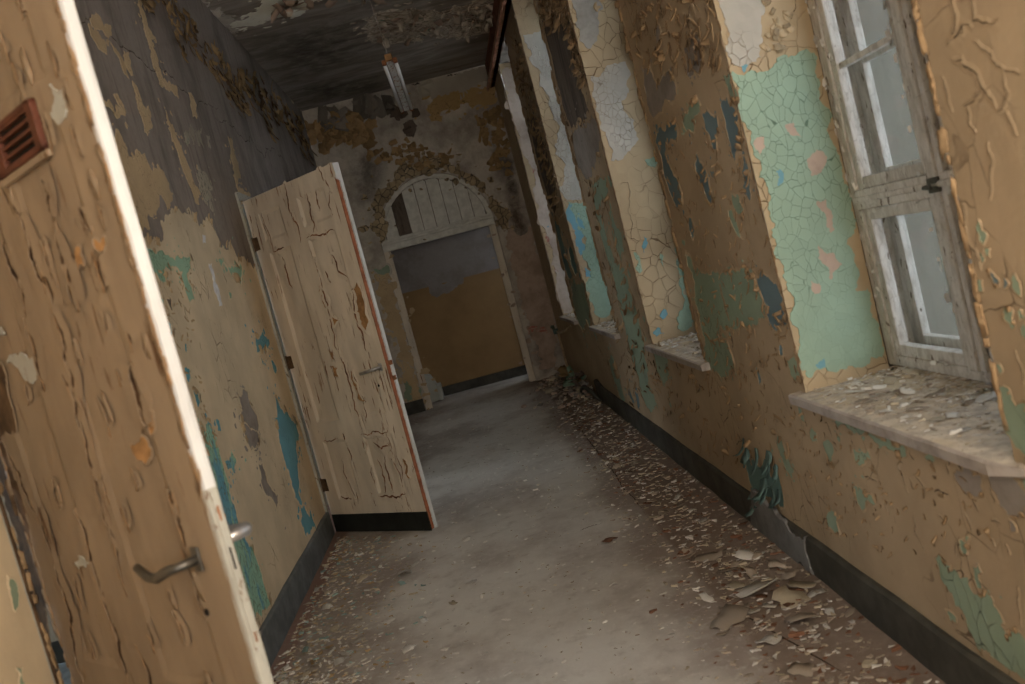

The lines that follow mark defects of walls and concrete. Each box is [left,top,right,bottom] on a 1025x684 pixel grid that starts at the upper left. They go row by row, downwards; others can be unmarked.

spalling [0,0,454,539]
spalling [807,150,827,176]
spalling [811,245,842,294]
peeling [911,0,1025,460]
crack [940,0,1021,272]
peeling [734,438,786,517]
peeling [780,406,916,559]
peeling [233,537,272,619]
peeling [930,467,1025,681]